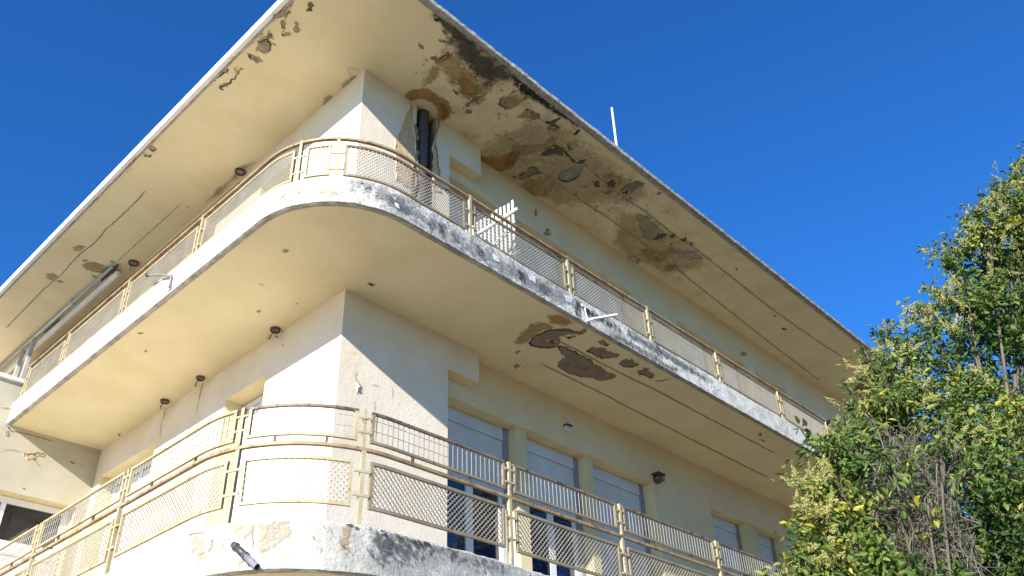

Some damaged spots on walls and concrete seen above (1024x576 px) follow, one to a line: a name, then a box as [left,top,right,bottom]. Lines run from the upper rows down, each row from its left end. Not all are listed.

peeling [214,2,300,90]
damp [415,14,578,126]
peeling [498,90,561,131]
spalling [557,139,645,201]
crack [6,191,145,328]
peeling [636,214,694,246]
spalling [527,327,671,382]
spalling [0,449,58,465]